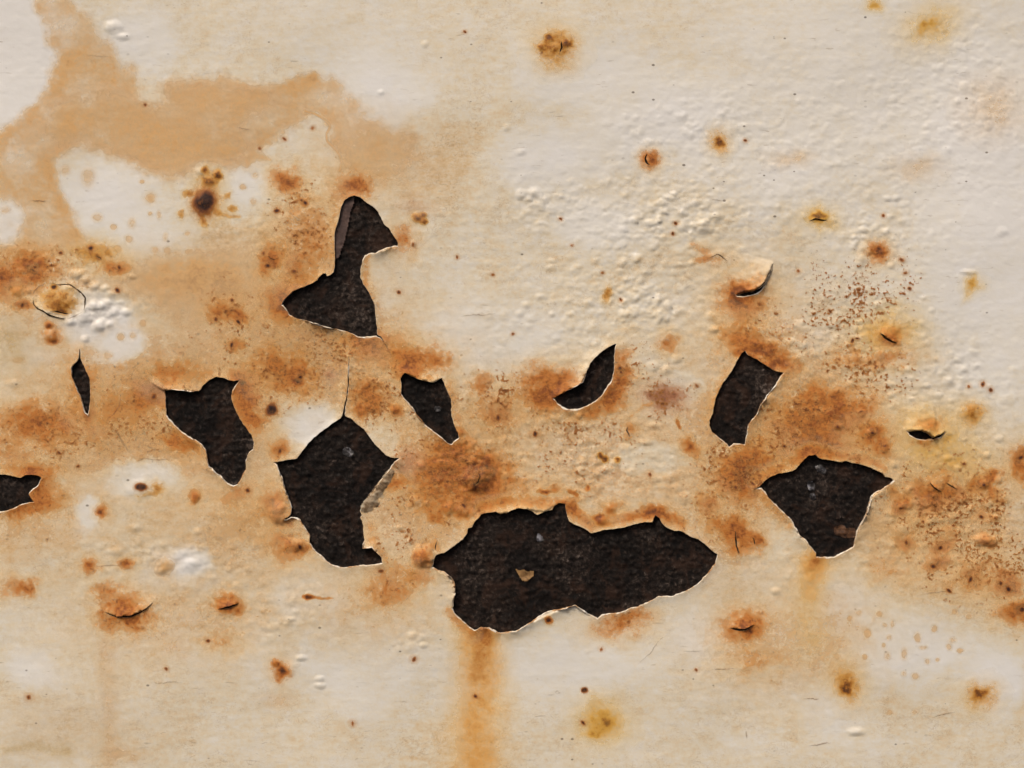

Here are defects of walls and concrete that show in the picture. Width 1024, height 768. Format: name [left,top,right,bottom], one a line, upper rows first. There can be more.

water stain [0,0,414,262]
peeling [281,195,398,342]
peeling [0,474,41,513]
peeling [164,377,254,487]
peeling [274,357,400,568]
peeling [400,373,459,445]
rust [0,166,1024,637]
peeling [432,503,718,634]
peeling [553,343,617,411]
peeling [709,351,784,448]
peeling [755,454,895,559]
rust [447,609,500,768]